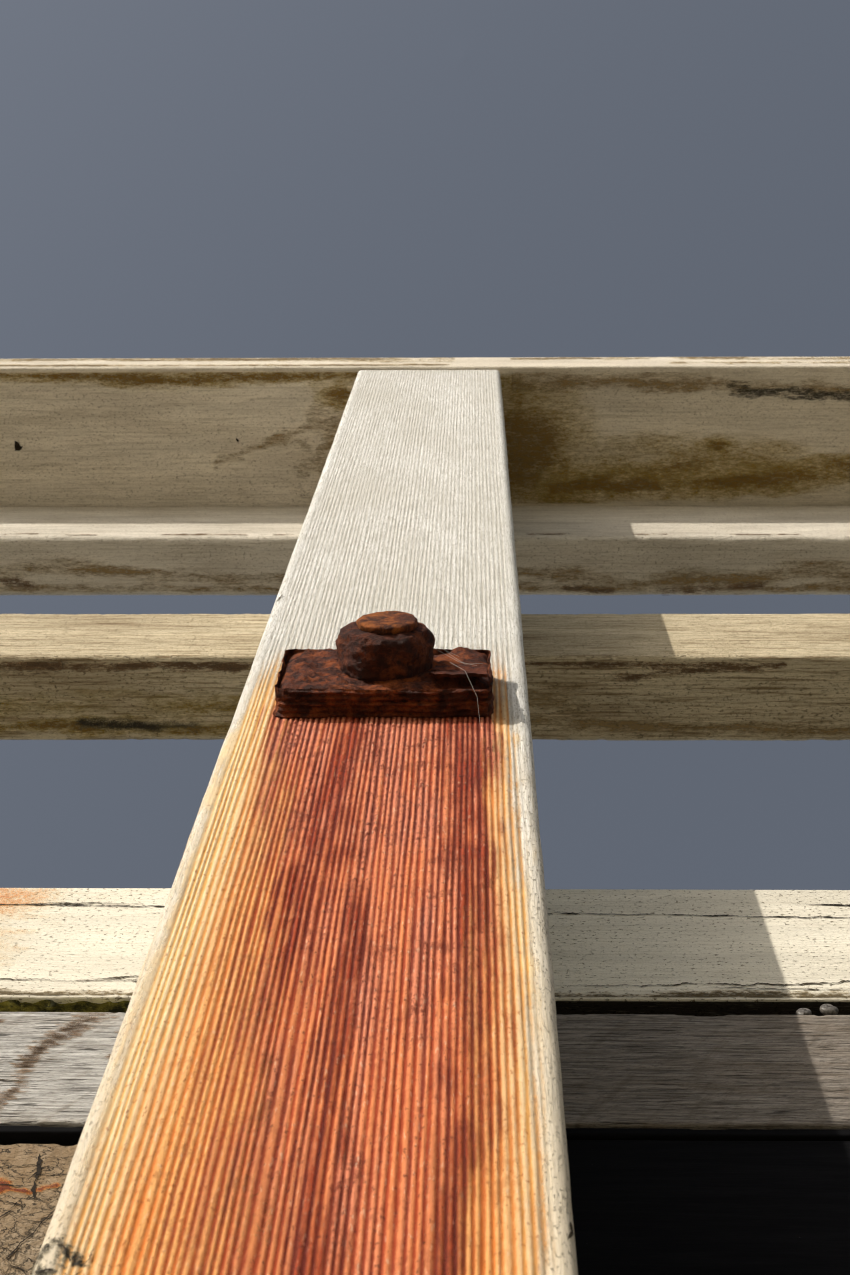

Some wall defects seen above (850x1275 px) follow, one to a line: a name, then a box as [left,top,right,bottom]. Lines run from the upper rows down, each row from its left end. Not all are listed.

water stain [500,372,850,504]
rust [0,888,48,913]
crack [0,900,165,908]
crack [548,904,850,918]
crack [0,974,139,982]
rust [55,665,547,1275]
crack [574,980,849,990]
water stain [0,1013,120,1109]
rust [0,1178,60,1194]
crack [0,1153,110,1275]